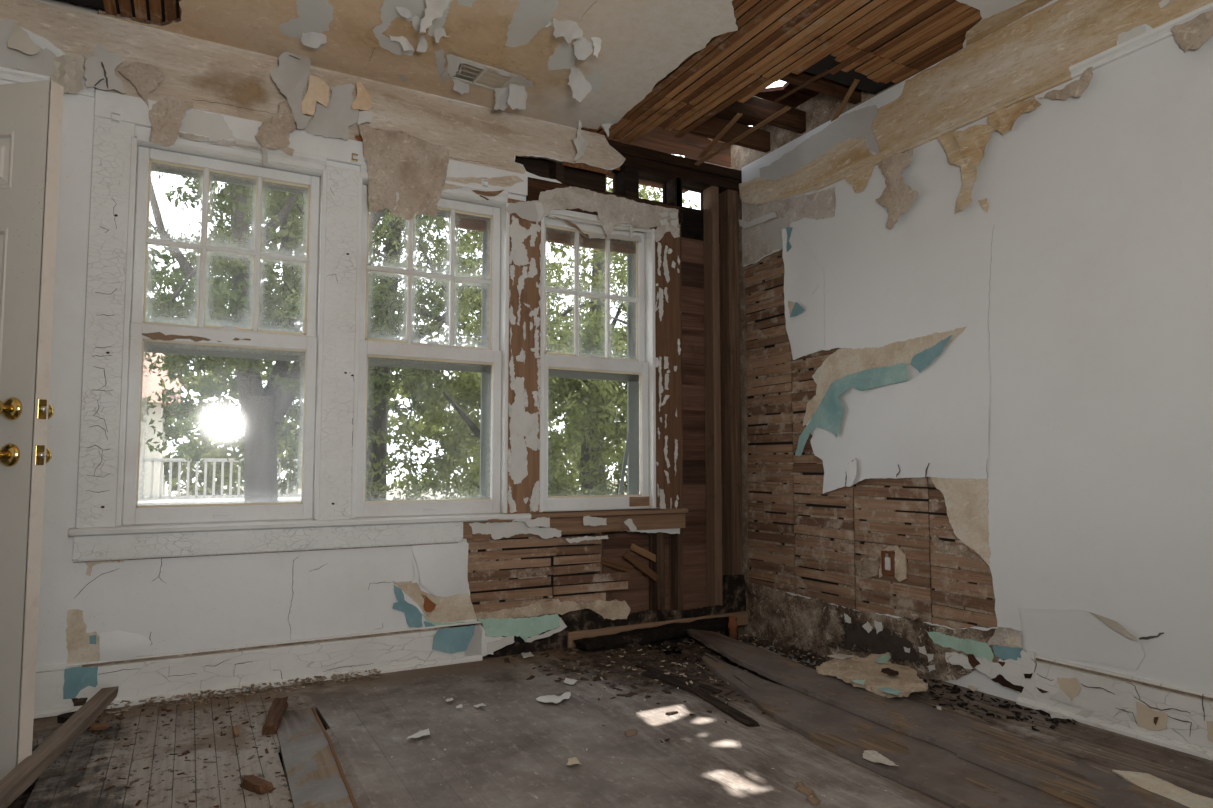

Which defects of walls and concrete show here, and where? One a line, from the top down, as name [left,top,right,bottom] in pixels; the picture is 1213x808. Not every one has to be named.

peeling [0,0,1213,205]
peeling [142,332,251,342]
spalling [746,256,786,353]
crack [86,347,112,493]
peeling [393,186,681,654]
spalling [744,326,1094,719]
peeling [63,609,100,699]
crack [1032,659,1205,737]
peeling [1136,702,1168,731]